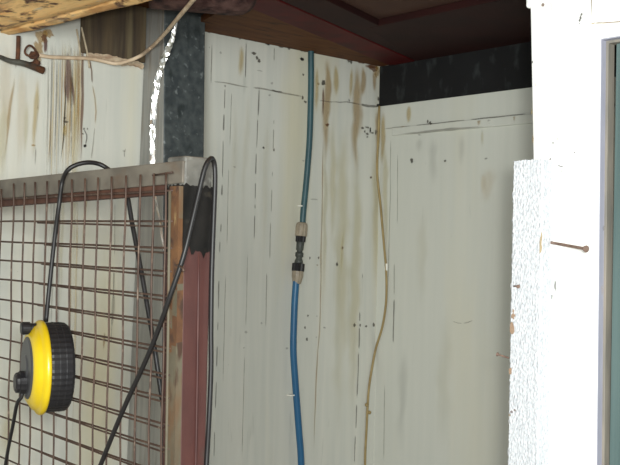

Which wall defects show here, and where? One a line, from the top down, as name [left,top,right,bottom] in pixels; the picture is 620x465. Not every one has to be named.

rust [34,30,53,53]
rust [61,53,84,157]